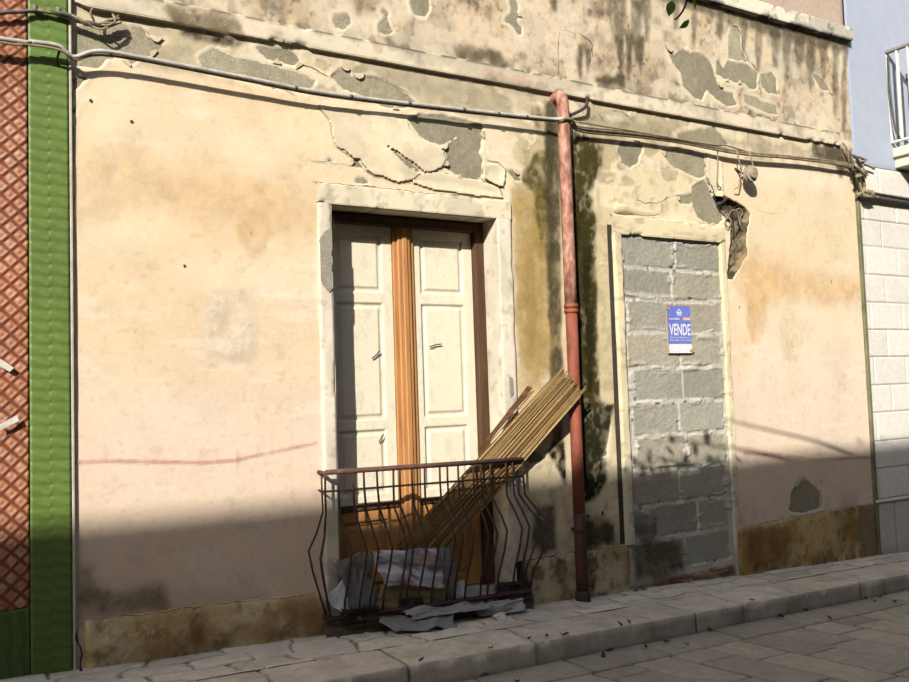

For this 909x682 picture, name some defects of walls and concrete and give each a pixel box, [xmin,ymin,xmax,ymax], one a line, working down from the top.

spalling [72,24,165,95]
leakage [165,3,236,33]
peeling [199,47,315,89]
leakage [597,0,647,86]
spalling [666,25,780,115]
leakage [727,9,847,91]
crack [314,105,503,199]
spalling [410,115,485,179]
leakage [573,149,597,199]
spalling [618,139,642,167]
flaking render [661,127,750,279]
leakage [574,210,596,393]